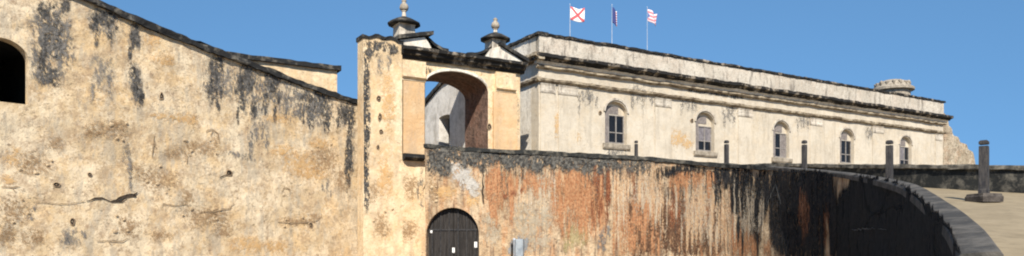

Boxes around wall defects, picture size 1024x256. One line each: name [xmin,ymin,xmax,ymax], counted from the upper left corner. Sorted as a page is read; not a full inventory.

damp [31,0,72,87]
damp [87,10,145,105]
damp [205,41,398,211]
crack [1,186,138,207]
corrosion [485,159,770,256]
damp [416,147,960,256]